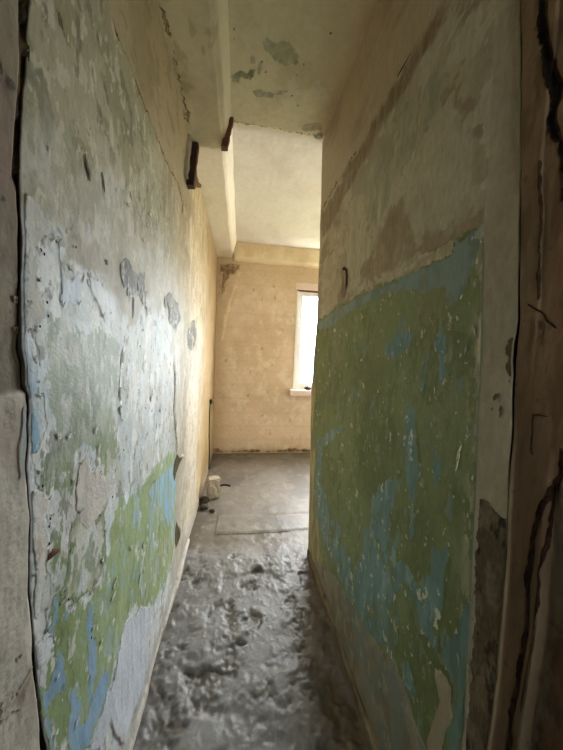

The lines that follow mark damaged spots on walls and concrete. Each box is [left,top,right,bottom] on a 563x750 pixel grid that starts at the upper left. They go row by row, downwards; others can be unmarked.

crack [113,21,184,213]
crack [157,0,191,123]
peeling [230,37,304,85]
crack [536,0,563,201]
peeling [316,199,483,332]
crack [535,160,543,300]
peeling [24,194,184,750]
peeling [308,376,450,704]
flaking render [427,661,453,750]
flaking render [464,499,506,750]
crack [506,450,563,750]
crack [530,414,548,455]